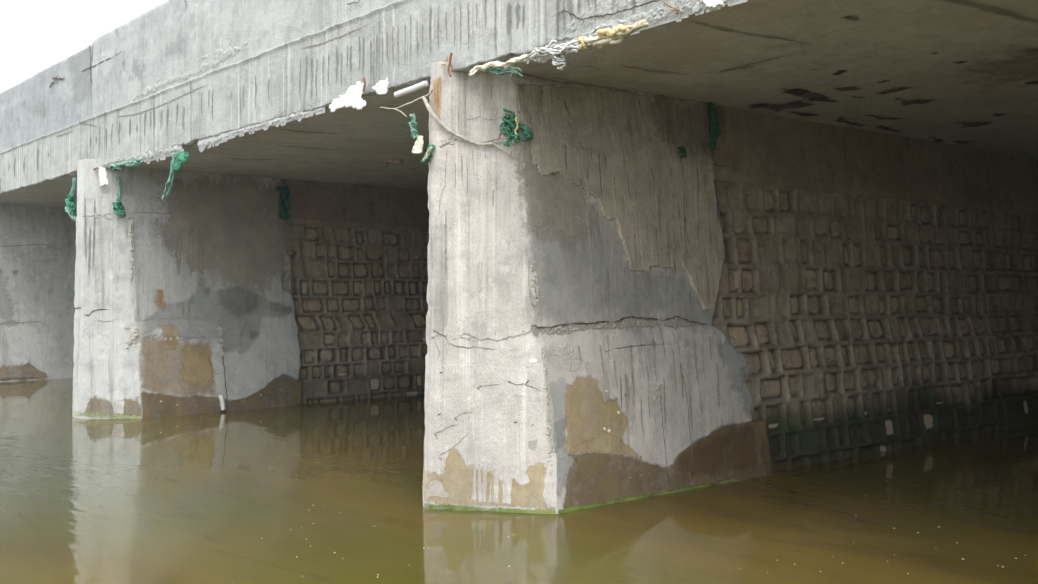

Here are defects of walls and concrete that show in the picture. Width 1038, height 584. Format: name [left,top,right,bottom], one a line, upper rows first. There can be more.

crack [421,329,531,360]
crack [602,329,666,409]
damp [85,374,302,419]
damp [543,352,772,508]
damp [426,480,450,498]
damp [471,462,529,504]